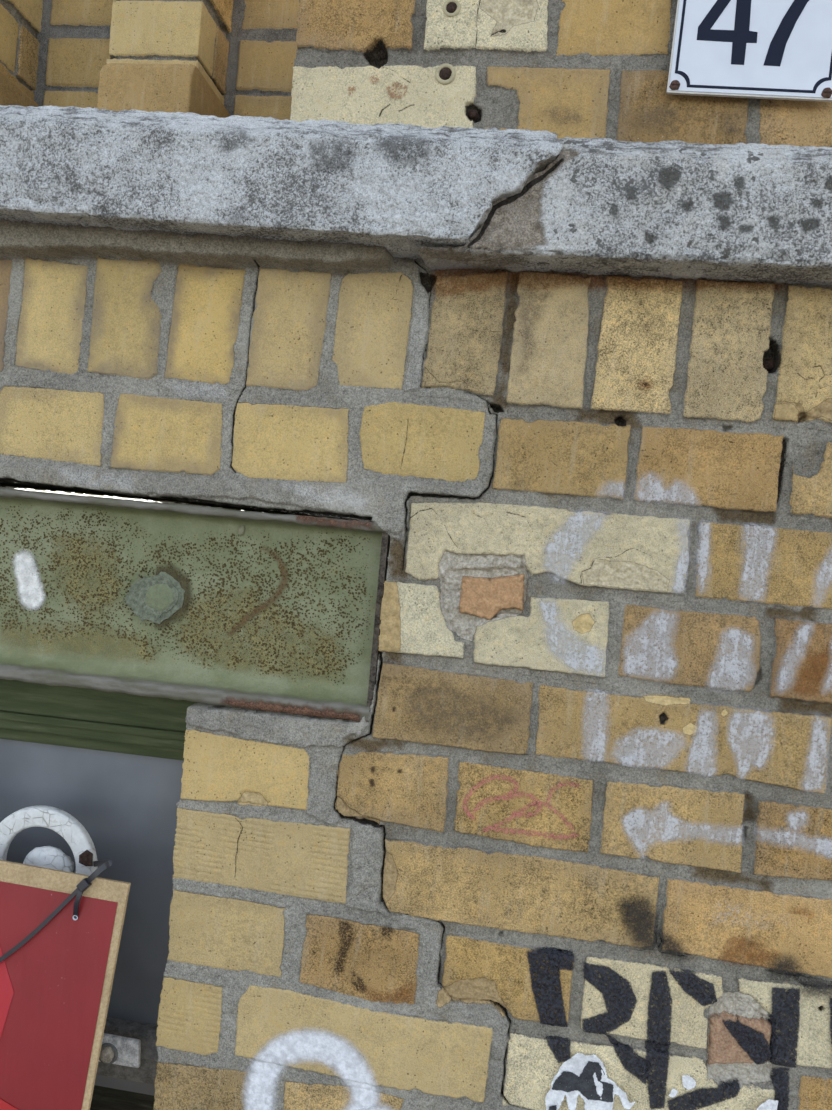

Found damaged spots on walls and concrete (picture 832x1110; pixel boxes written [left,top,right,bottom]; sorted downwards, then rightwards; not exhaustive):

crack [467,158,564,247]
crack [0,478,372,521]
crack [400,349,551,568]
rust [0,506,373,685]
spalling [439,551,528,641]
spalling [582,559,669,592]
rust [222,698,360,722]
crack [334,651,408,915]
crack [435,920,445,987]
crack [490,1000,511,1105]
spalling [669,991,773,1097]
peeling [757,1099,778,1110]